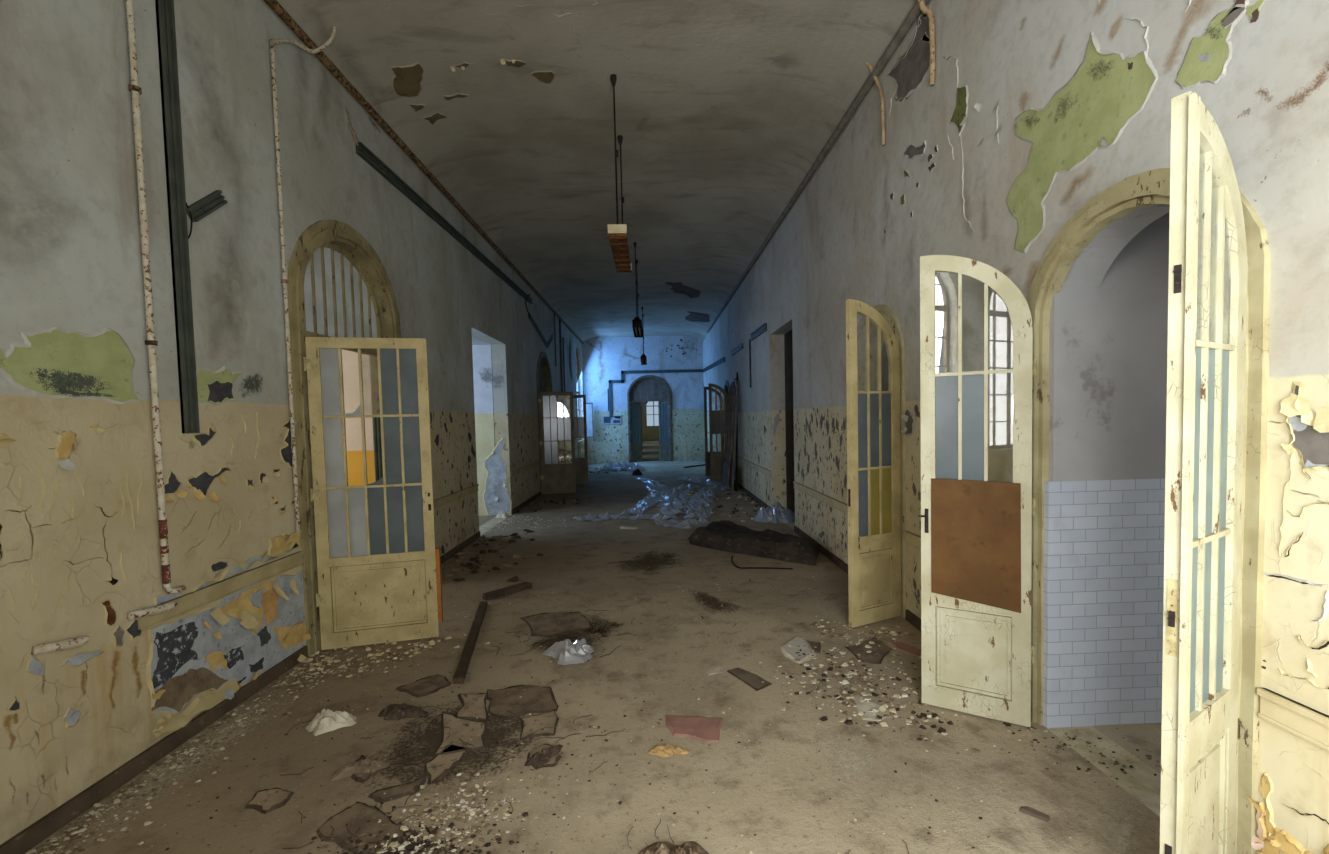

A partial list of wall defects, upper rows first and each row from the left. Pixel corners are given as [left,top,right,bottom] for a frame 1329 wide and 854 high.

peeling [390,63,470,125]
peeling [886,5,931,103]
peeling [950,32,1158,254]
peeling [1175,0,1264,90]
peeling [0,326,140,405]
peeling [1280,381,1329,473]
crack [0,431,143,584]
peeling [164,466,232,503]
peeling [796,408,848,557]
crack [1261,390,1329,689]
spalling [25,530,313,738]
peeling [1246,773,1329,854]